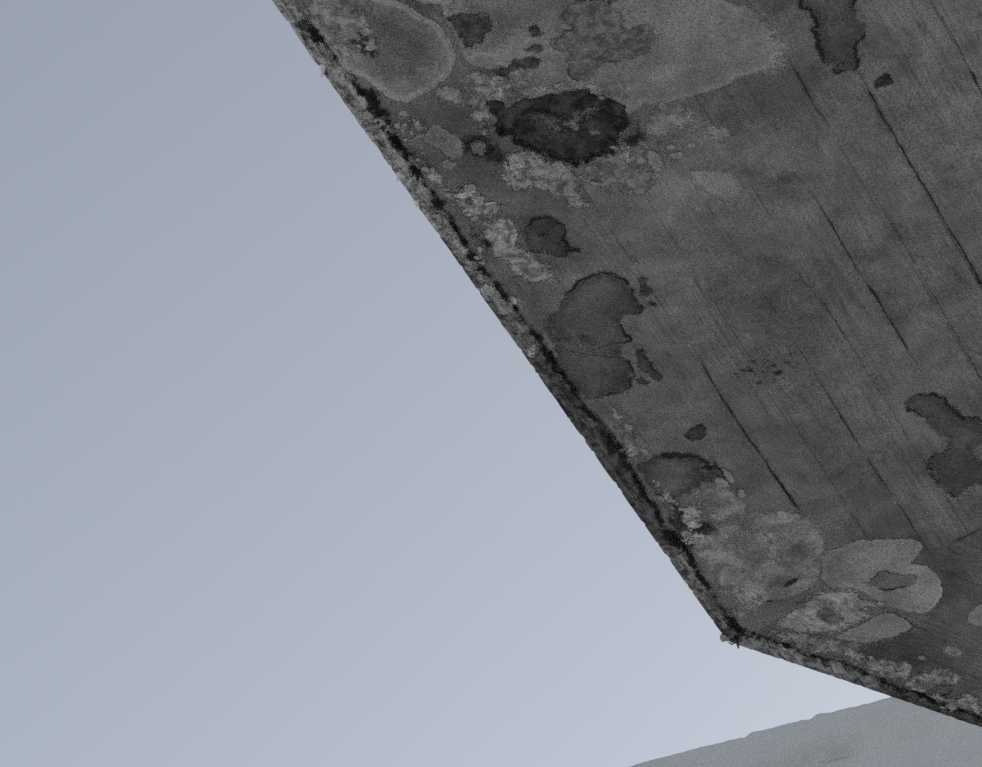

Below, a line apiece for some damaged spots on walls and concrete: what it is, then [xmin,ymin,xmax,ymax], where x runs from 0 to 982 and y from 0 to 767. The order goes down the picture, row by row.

damp [301,0,982,720]